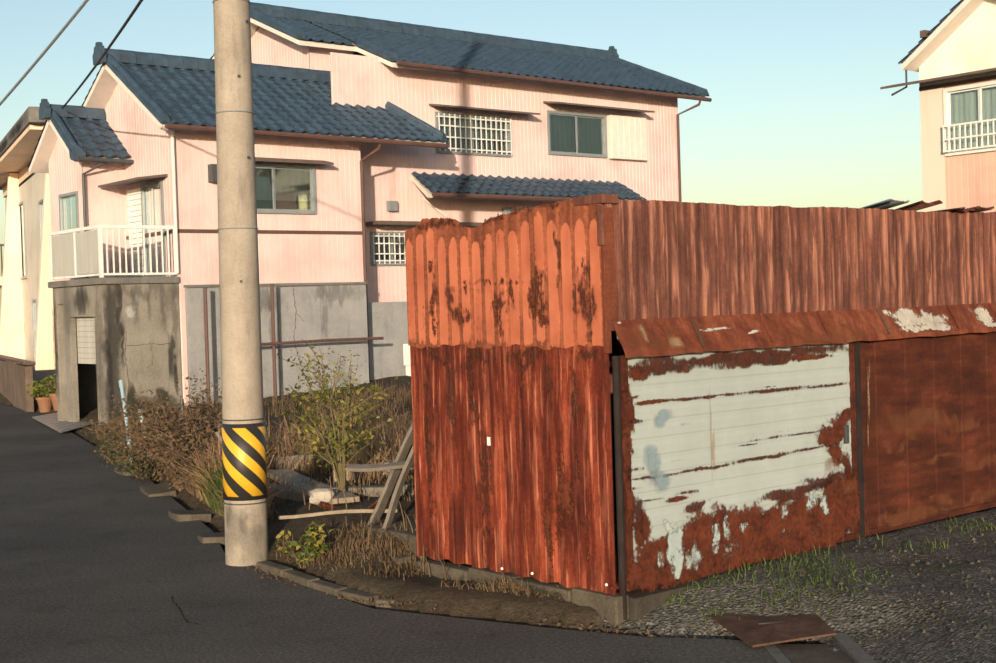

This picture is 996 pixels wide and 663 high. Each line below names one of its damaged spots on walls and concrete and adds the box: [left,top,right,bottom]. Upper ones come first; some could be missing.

rust [415,217,455,230]
rust [483,203,560,225]
rust [553,232,562,286]
peeling [883,308,950,333]
peeling [969,307,996,327]
rust [410,261,865,599]
peeling [806,491,829,514]
peeling [712,516,748,553]
peeling [657,520,701,579]